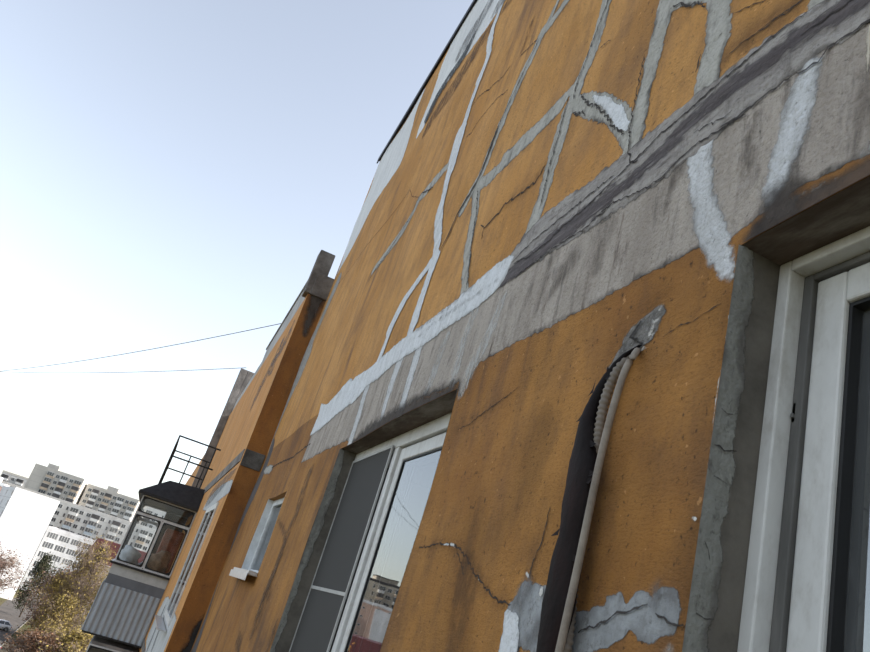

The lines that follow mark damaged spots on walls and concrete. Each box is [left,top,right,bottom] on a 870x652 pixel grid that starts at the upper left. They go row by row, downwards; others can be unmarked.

crack [339,0,870,361]
flaking render [608,306,666,368]
crack [419,542,511,606]
crack [528,509,550,578]